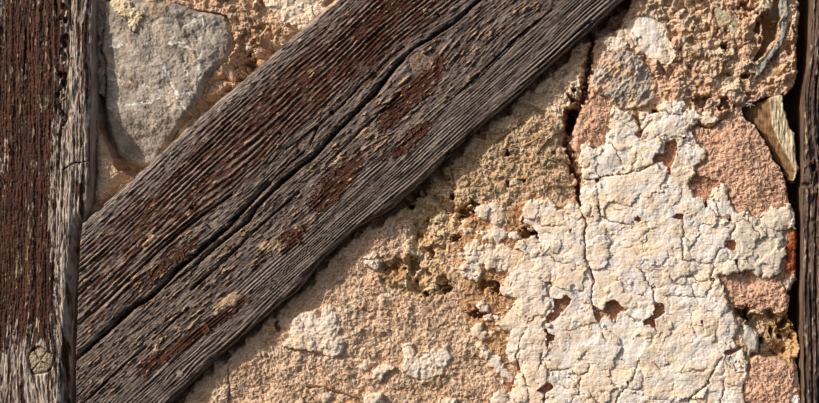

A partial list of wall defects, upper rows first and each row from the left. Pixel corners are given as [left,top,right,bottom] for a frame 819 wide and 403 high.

peeling [0,0,92,403]
peeling [356,0,801,403]
crack [517,28,742,403]
crack [636,188,785,315]